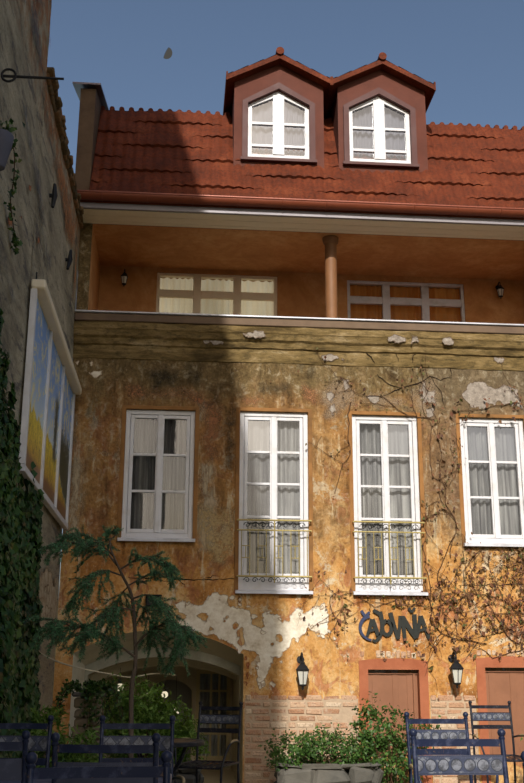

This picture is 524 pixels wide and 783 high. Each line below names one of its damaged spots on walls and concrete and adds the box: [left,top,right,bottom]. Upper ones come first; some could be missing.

peeling [243,330,266,339]
peeling [387,334,420,344]
flaking render [461,382,524,410]
crack [128,575,234,586]
flaking render [174,592,359,783]